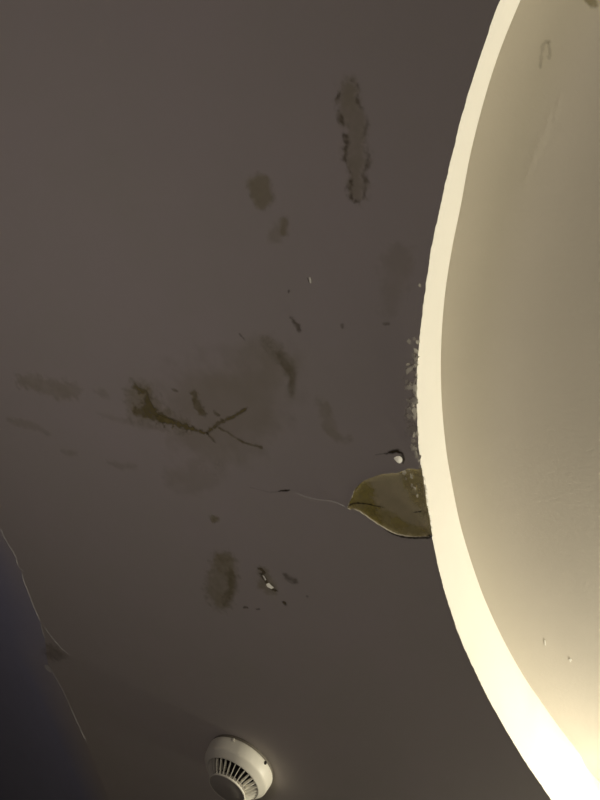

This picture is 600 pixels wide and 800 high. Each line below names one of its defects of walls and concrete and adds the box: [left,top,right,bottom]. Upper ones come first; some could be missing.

spalling [347,337,432,539]